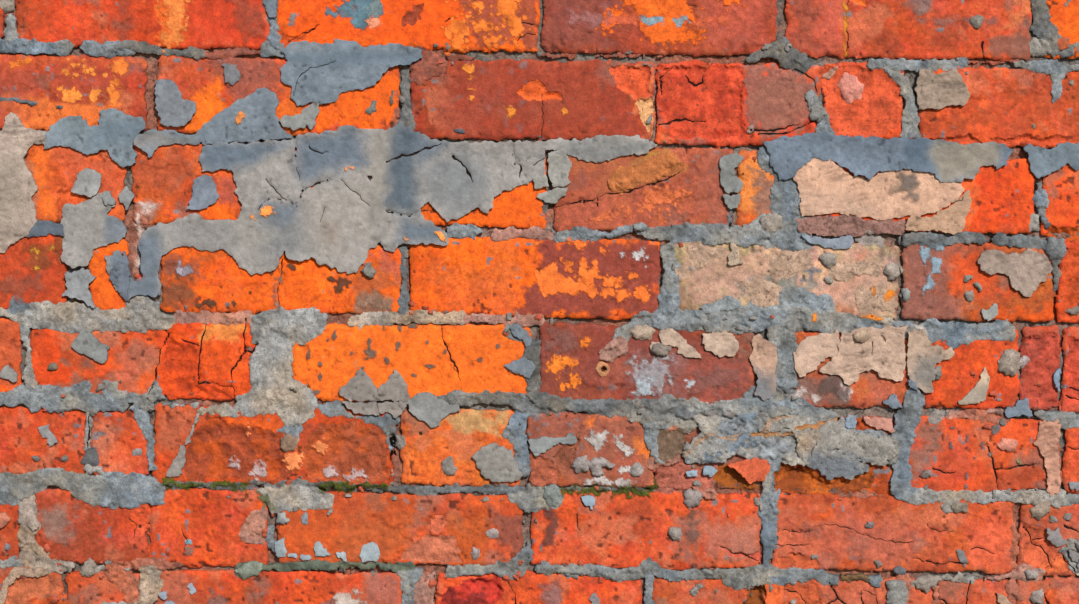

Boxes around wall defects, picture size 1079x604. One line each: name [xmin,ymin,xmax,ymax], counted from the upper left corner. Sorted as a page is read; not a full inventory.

crack [259,145,428,222]
flaking render [0,30,748,308]
crack [386,144,473,182]
crack [512,100,556,178]
flaking render [763,65,1079,249]
flaking render [977,225,1079,322]
crack [441,324,461,380]
flaking render [650,325,955,495]
flaking render [958,367,990,405]
spalling [1004,333,1079,497]
crack [721,524,995,604]
crack [1023,524,1079,573]